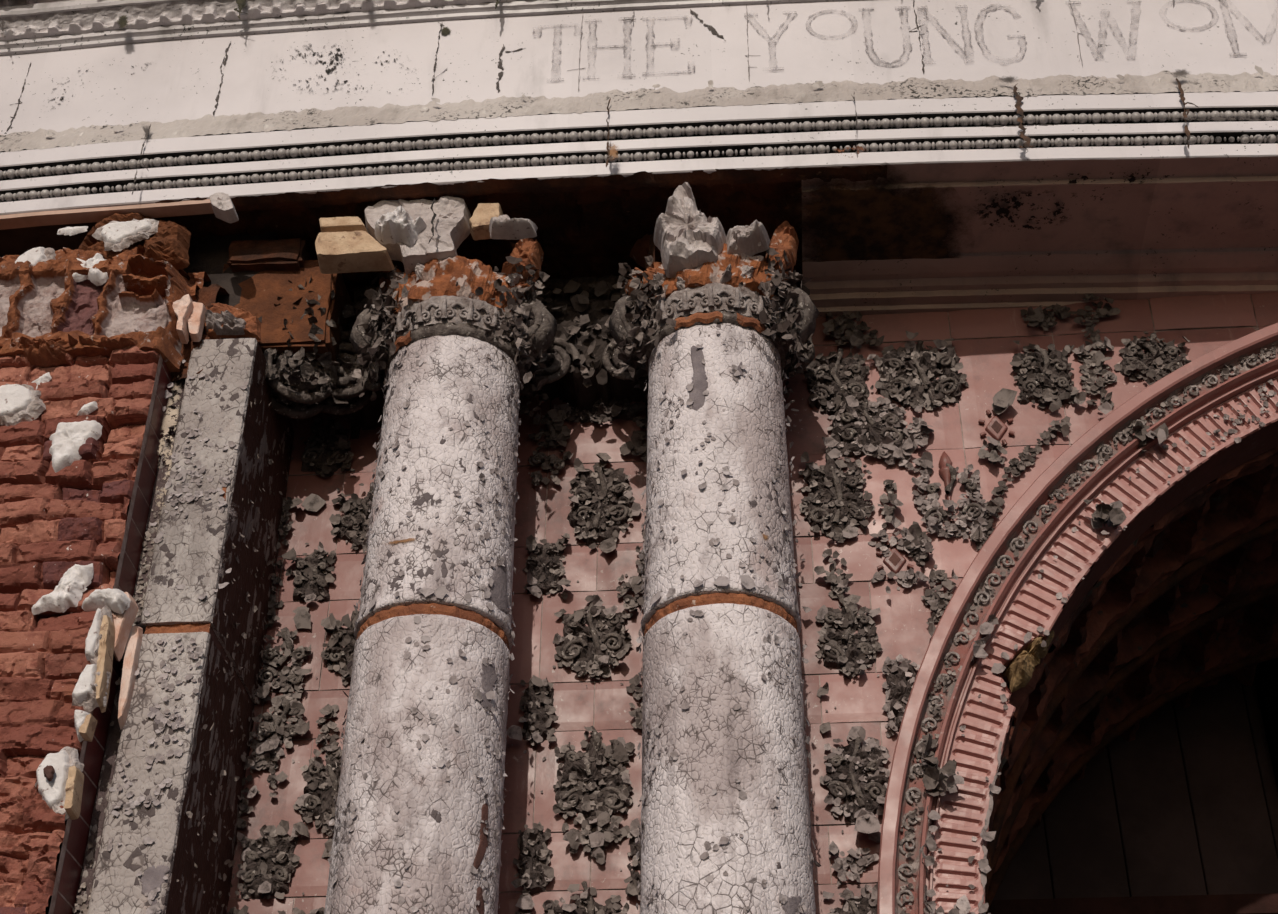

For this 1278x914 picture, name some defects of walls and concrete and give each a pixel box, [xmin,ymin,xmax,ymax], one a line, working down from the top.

crack [7,63,31,131]
crack [213,0,247,115]
crack [432,22,446,96]
crack [1013,84,1035,153]
peeling [1041,344,1278,521]
spalling [0,245,1192,914]